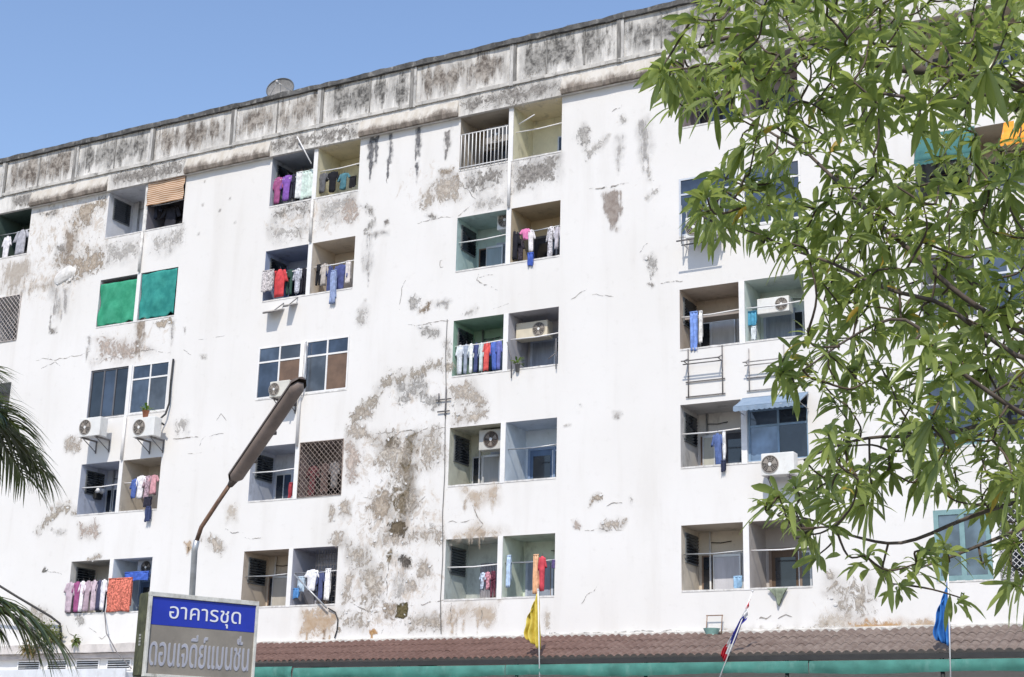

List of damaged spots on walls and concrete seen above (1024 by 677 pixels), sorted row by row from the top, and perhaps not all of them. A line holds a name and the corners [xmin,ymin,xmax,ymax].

leakage [421,2,737,112]
leakage [11,71,408,216]
leakage [440,130,559,209]
leakage [639,119,658,199]
peeling [69,196,107,233]
leakage [270,194,355,242]
peeling [55,245,108,282]
peeling [64,434,82,453]
peeling [35,505,101,540]
peeling [328,358,488,634]
peeling [601,518,627,530]
peeling [826,569,878,624]